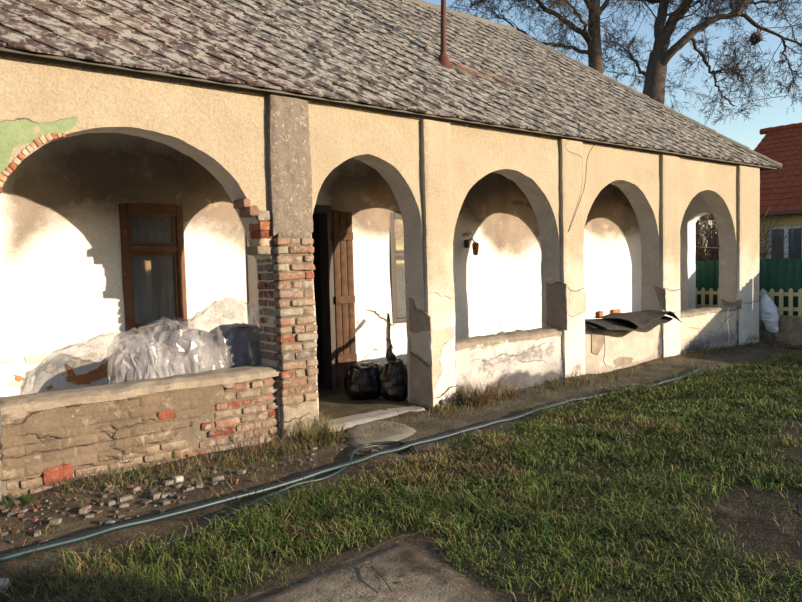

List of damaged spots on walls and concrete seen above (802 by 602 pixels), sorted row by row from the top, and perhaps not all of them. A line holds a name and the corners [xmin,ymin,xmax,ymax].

peeling [0,116,78,194]
spalling [546,282,587,331]
spalling [0,199,319,499]
spalling [408,297,460,409]
crack [0,409,157,463]